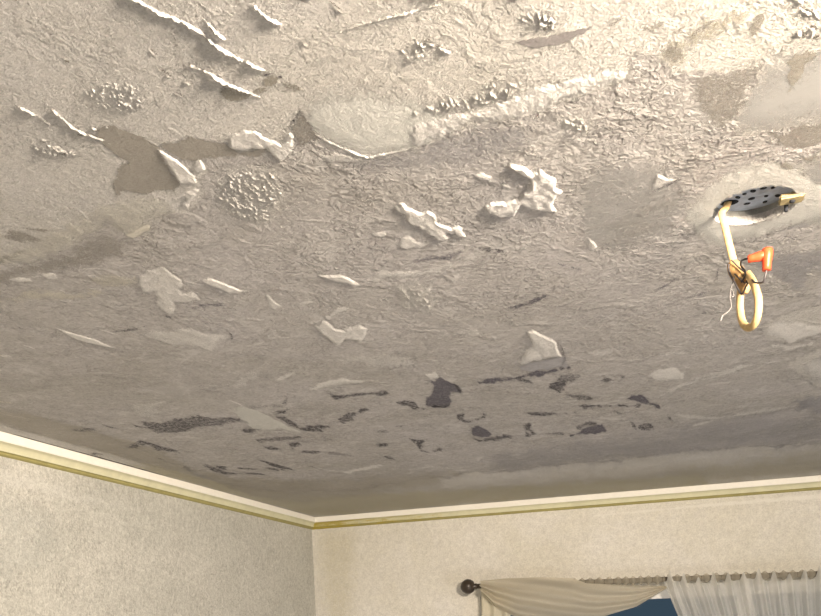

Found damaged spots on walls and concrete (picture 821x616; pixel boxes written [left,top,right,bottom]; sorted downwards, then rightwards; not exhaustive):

peeling [0,5,821,494]